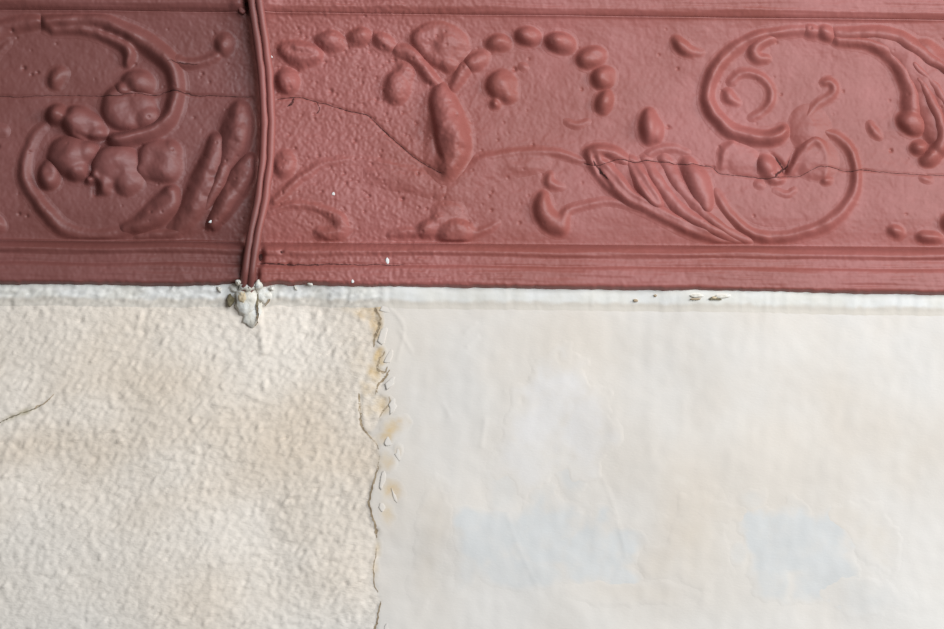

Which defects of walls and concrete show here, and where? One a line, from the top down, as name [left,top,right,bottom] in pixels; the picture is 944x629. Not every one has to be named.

crack [1,90,243,98]
crack [277,97,441,173]
crack [585,157,944,180]
peeling [373,306,397,417]
crack [0,394,54,425]
peeling [368,456,397,537]
peeling [373,549,389,629]